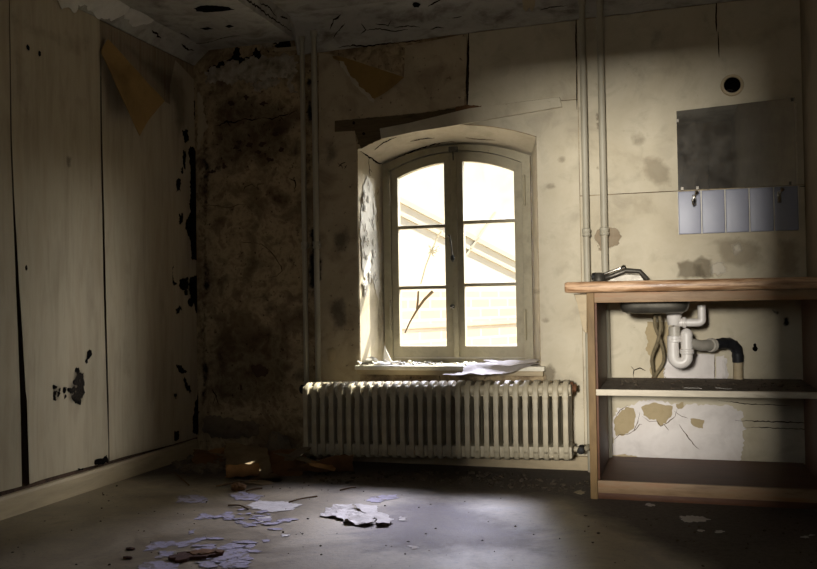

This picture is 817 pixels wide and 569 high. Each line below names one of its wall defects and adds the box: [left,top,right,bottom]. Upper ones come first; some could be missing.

peeling [58,0,154,27]
crack [713,3,721,54]
peeling [176,129,197,260]
peeling [172,266,197,314]
leakage [309,229,321,295]
peeling [359,175,380,300]
leakage [679,259,726,277]
spalling [645,322,669,378]
peeling [612,399,746,461]